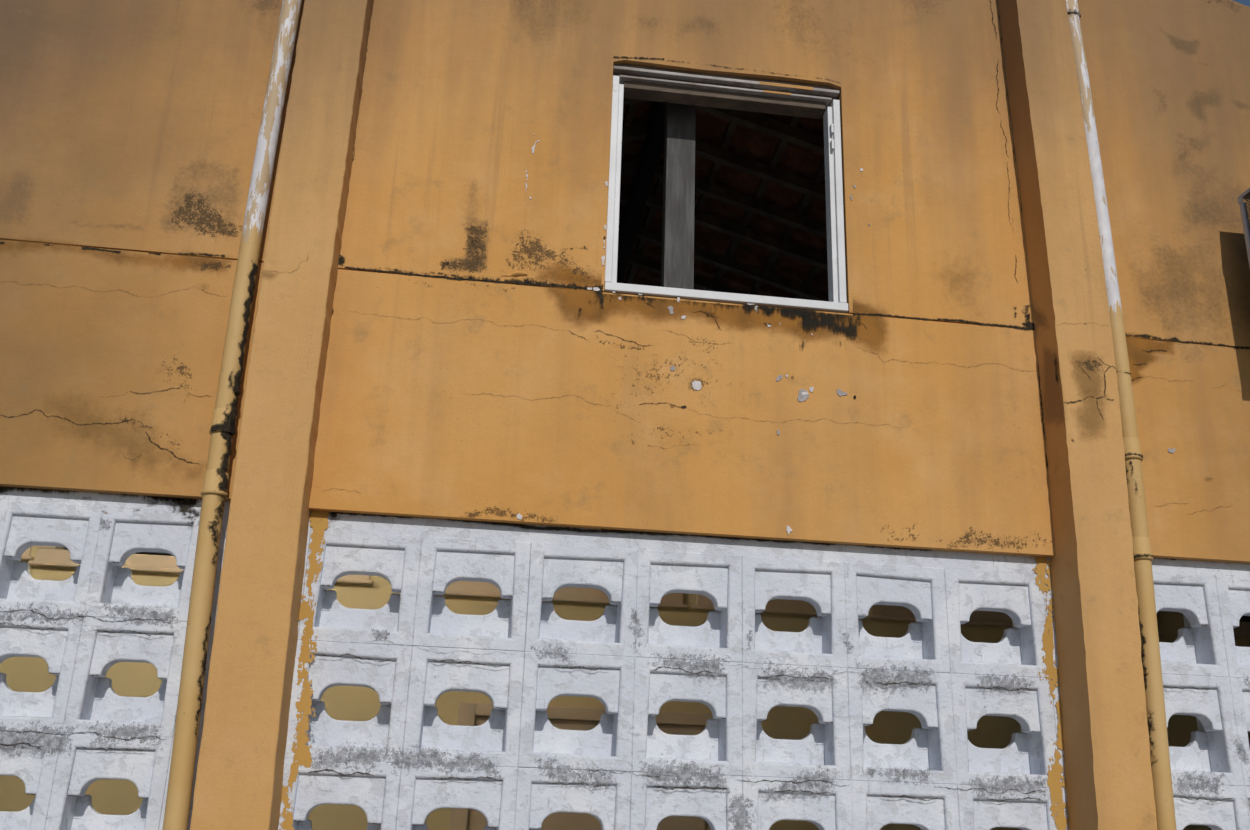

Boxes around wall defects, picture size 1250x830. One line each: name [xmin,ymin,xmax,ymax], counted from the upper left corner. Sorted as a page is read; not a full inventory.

crack [990,1,1022,224]
damp [149,252,231,271]
damp [171,191,242,237]
damp [338,226,1035,348]
crack [2,358,208,464]
damp [0,260,258,564]
peeling [776,375,814,402]
crack [1038,357,1131,467]
damp [1075,357,1105,431]
damp [195,617,211,735]